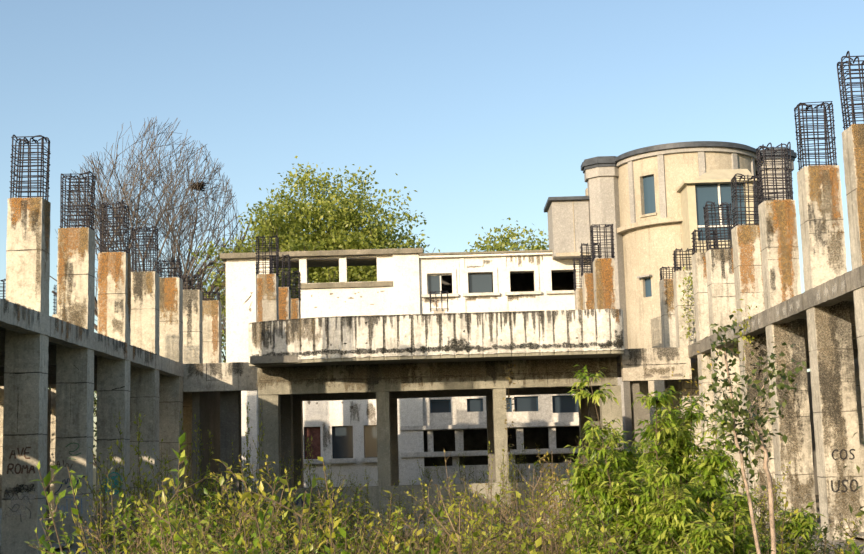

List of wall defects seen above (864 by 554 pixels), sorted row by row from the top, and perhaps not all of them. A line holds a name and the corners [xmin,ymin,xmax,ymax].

rust [808,165,841,232]
rust [851,124,864,264]
rust [9,197,88,318]
rust [98,252,131,336]
rust [737,199,796,302]
water stain [188,362,243,378]
water stain [350,402,376,425]
water stain [250,295,678,389]